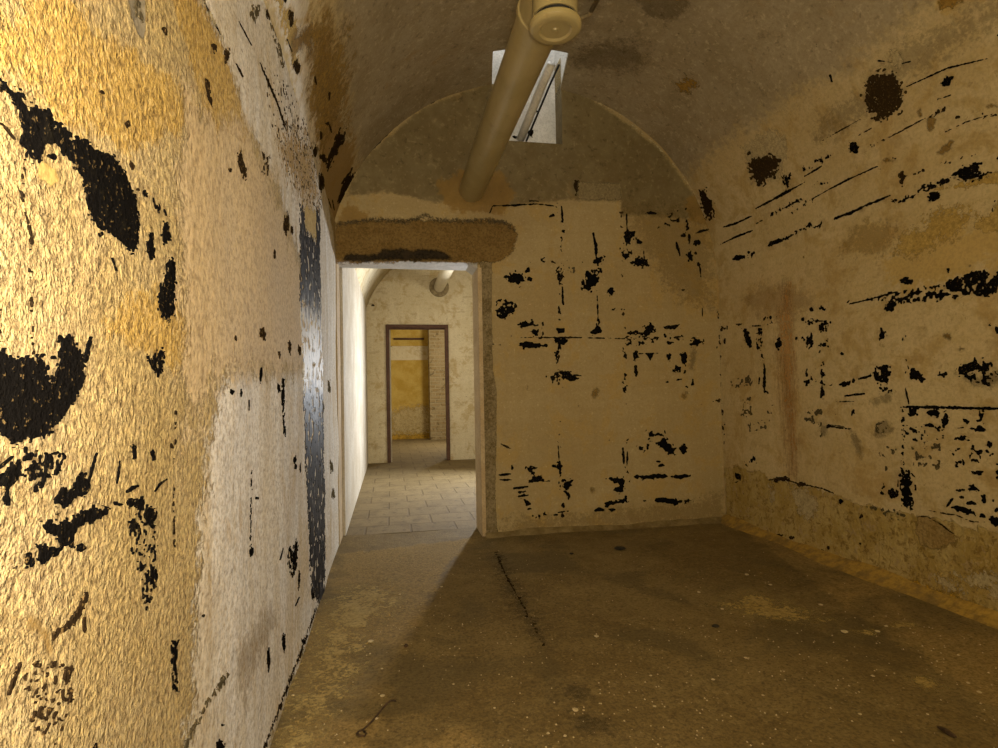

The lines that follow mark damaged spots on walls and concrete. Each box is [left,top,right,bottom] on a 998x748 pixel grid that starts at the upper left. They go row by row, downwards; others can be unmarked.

peeling [0,78,172,260]
leakage [720,151,831,247]
leakage [834,162,993,220]
leakage [919,109,936,131]
peeling [0,333,168,611]
peeling [157,257,178,326]
leakage [299,200,326,606]
peeling [495,232,615,383]
peeling [594,430,694,512]
peeling [795,305,892,437]
spalling [859,357,998,550]
crack [494,552,545,646]